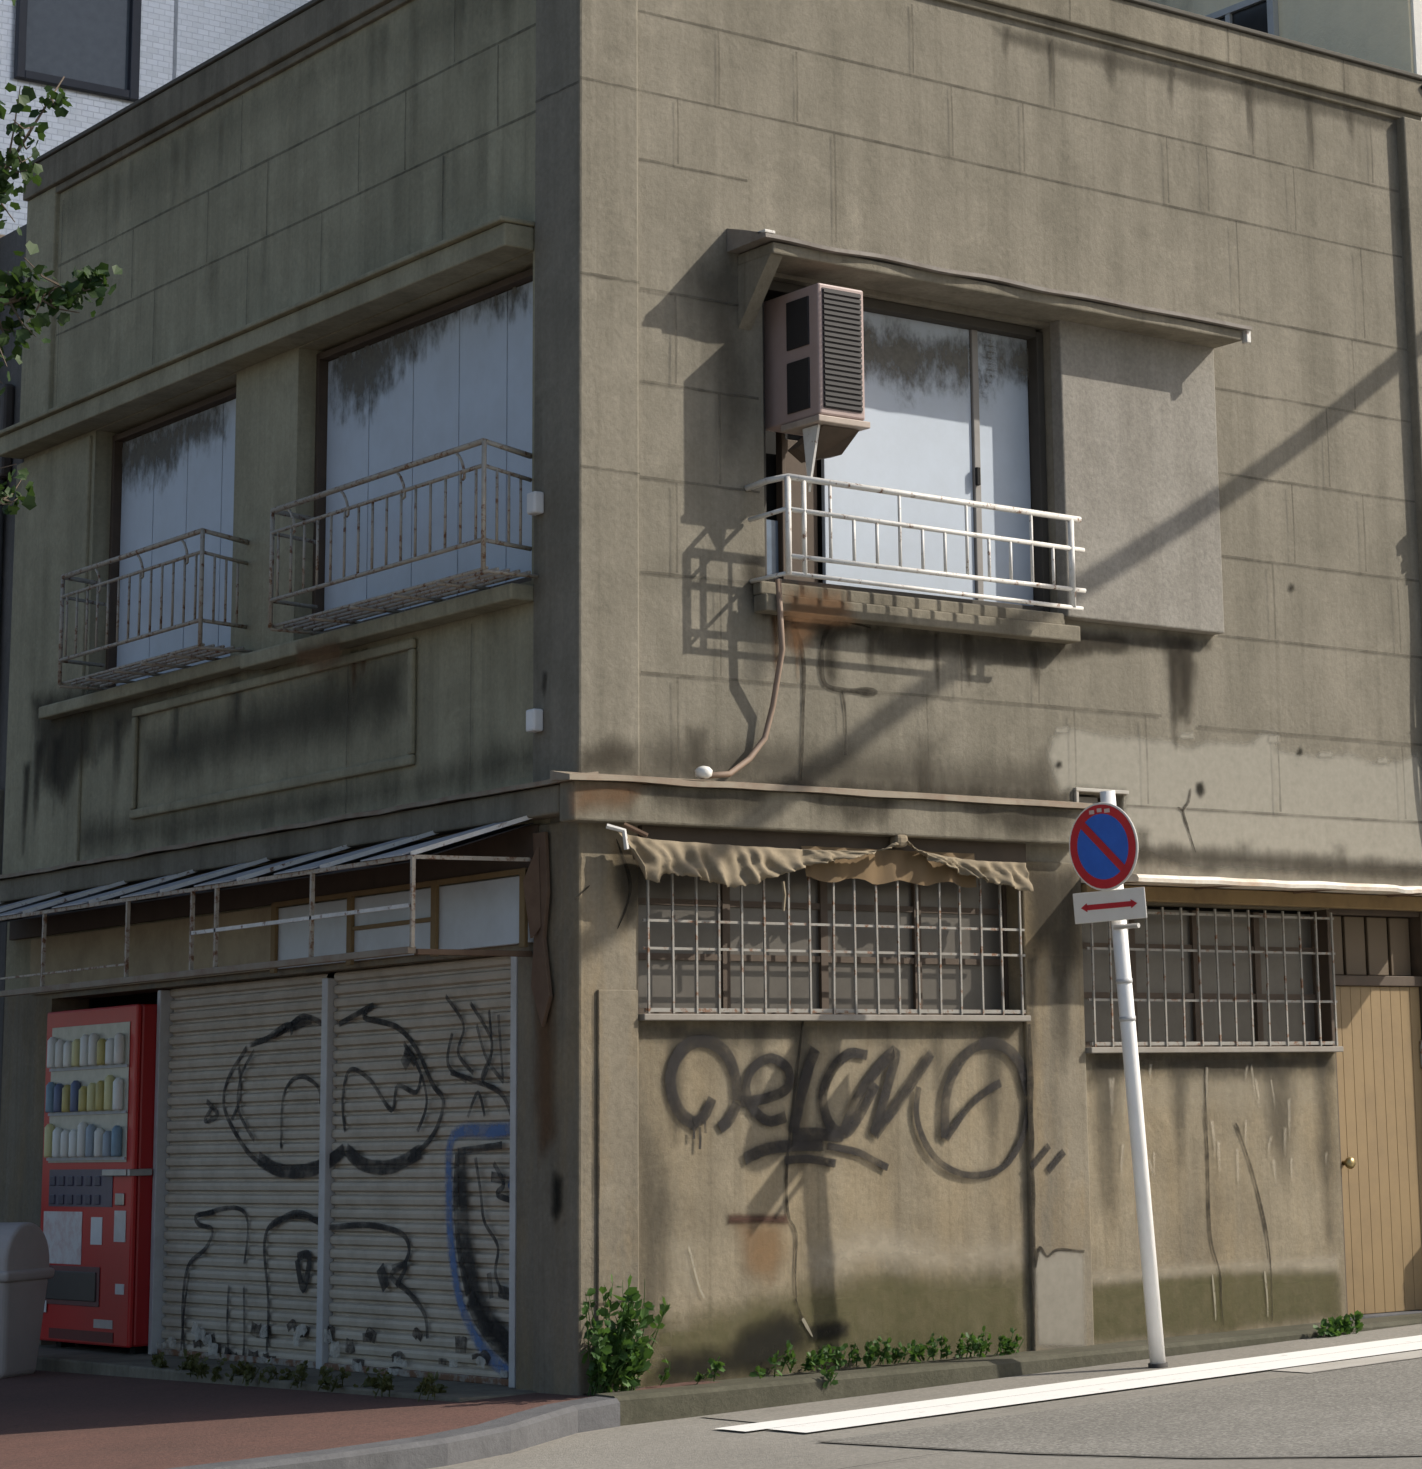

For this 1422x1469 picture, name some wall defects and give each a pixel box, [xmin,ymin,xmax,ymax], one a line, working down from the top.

damp [784,621,1193,715]
damp [23,691,90,824]
crack [1205,1066,1273,1325]
damp [660,1316,847,1381]